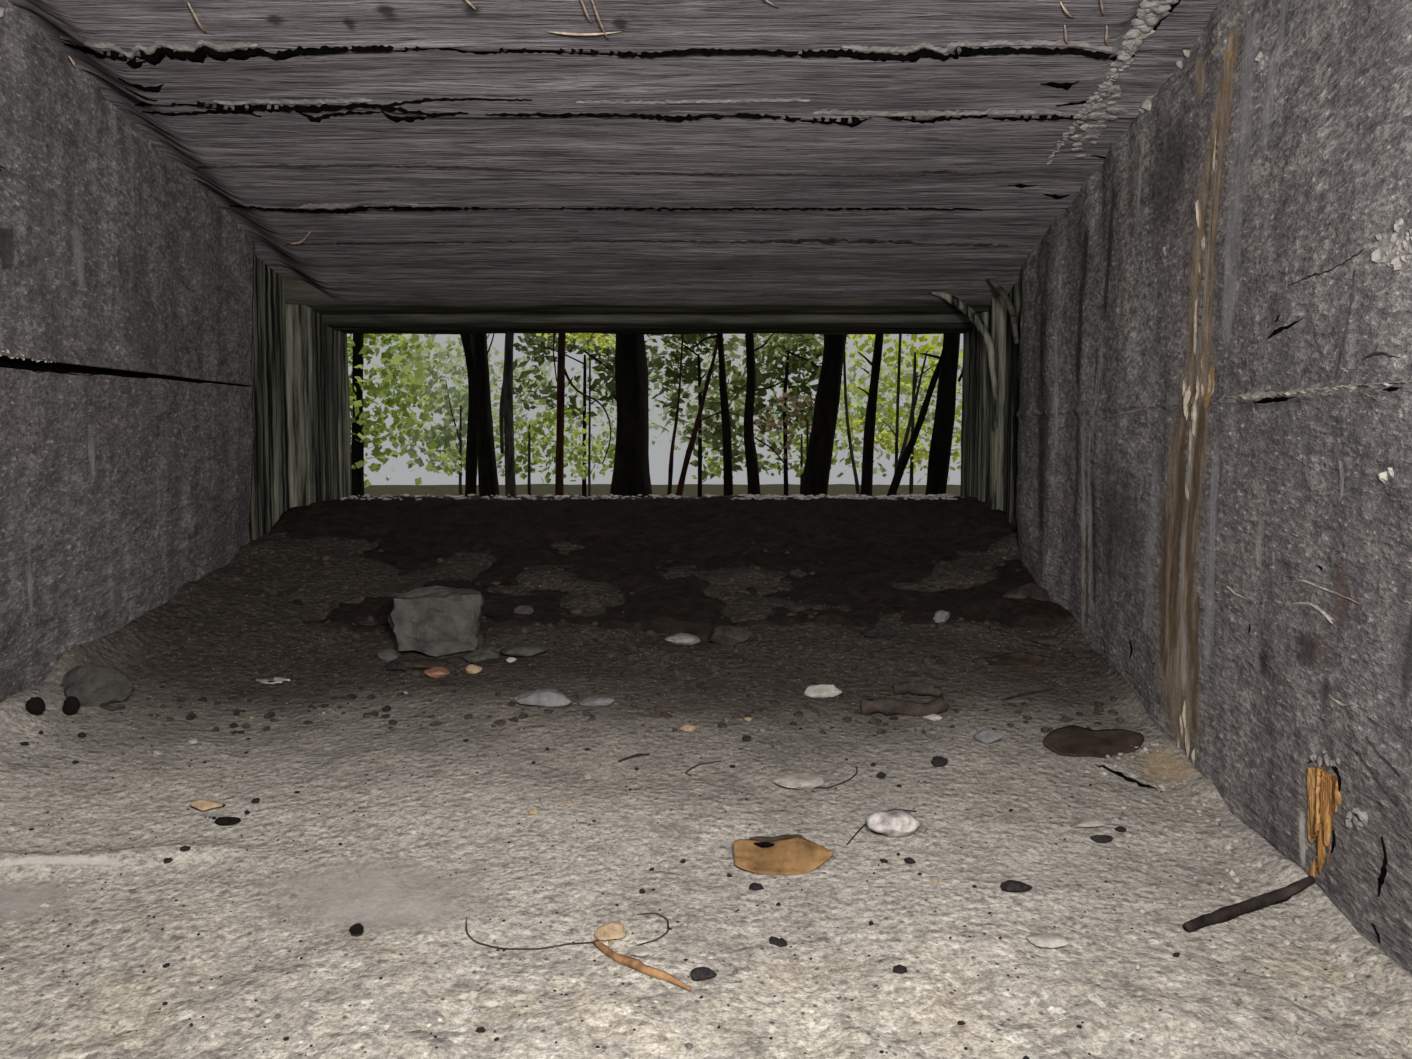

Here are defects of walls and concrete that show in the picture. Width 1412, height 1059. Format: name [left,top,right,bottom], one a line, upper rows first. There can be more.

crack [60,36,1135,128]
spalling [1047,0,1181,165]
spalling [1255,51,1269,77]
crack [197,164,1070,247]
crack [0,349,247,386]
rust [1159,29,1238,766]
spalling [1307,749,1341,791]
spalling [1331,808,1368,853]